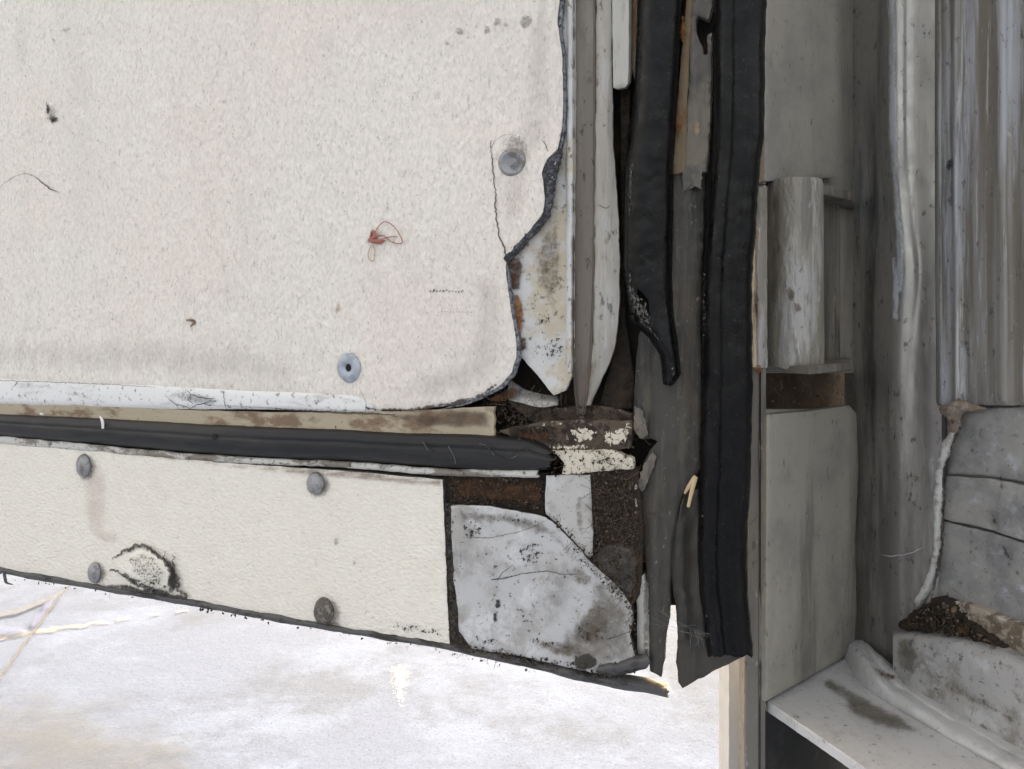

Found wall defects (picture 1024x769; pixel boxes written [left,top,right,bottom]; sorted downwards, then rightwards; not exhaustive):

crack [490,142,507,257]
rust [508,259,526,350]
peeling [542,423,632,450]
damp [826,681,911,728]